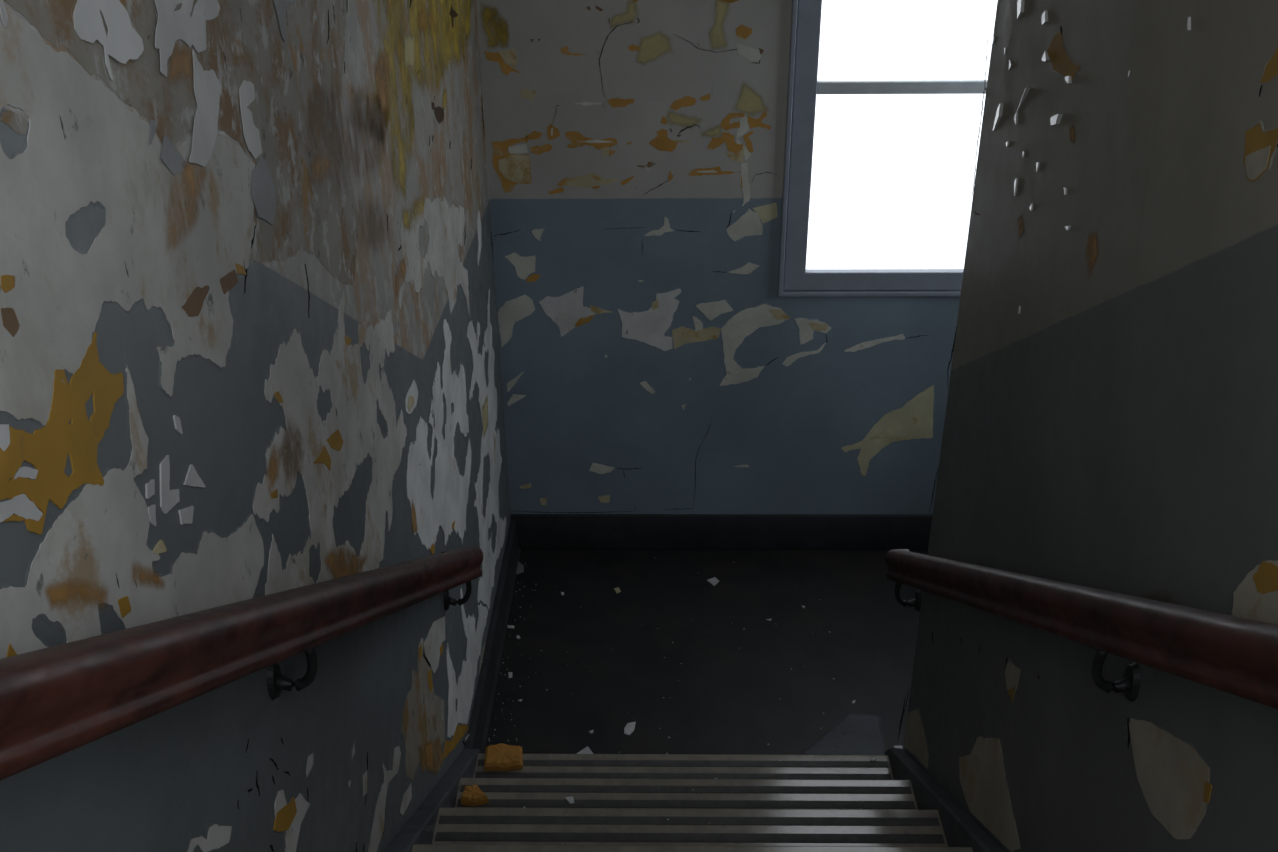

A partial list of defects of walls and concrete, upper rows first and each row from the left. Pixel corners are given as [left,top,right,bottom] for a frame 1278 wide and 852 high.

peeling [1041,26,1081,83]
peeling [844,333,926,353]
peeling [0,0,833,852]
peeling [840,384,935,477]